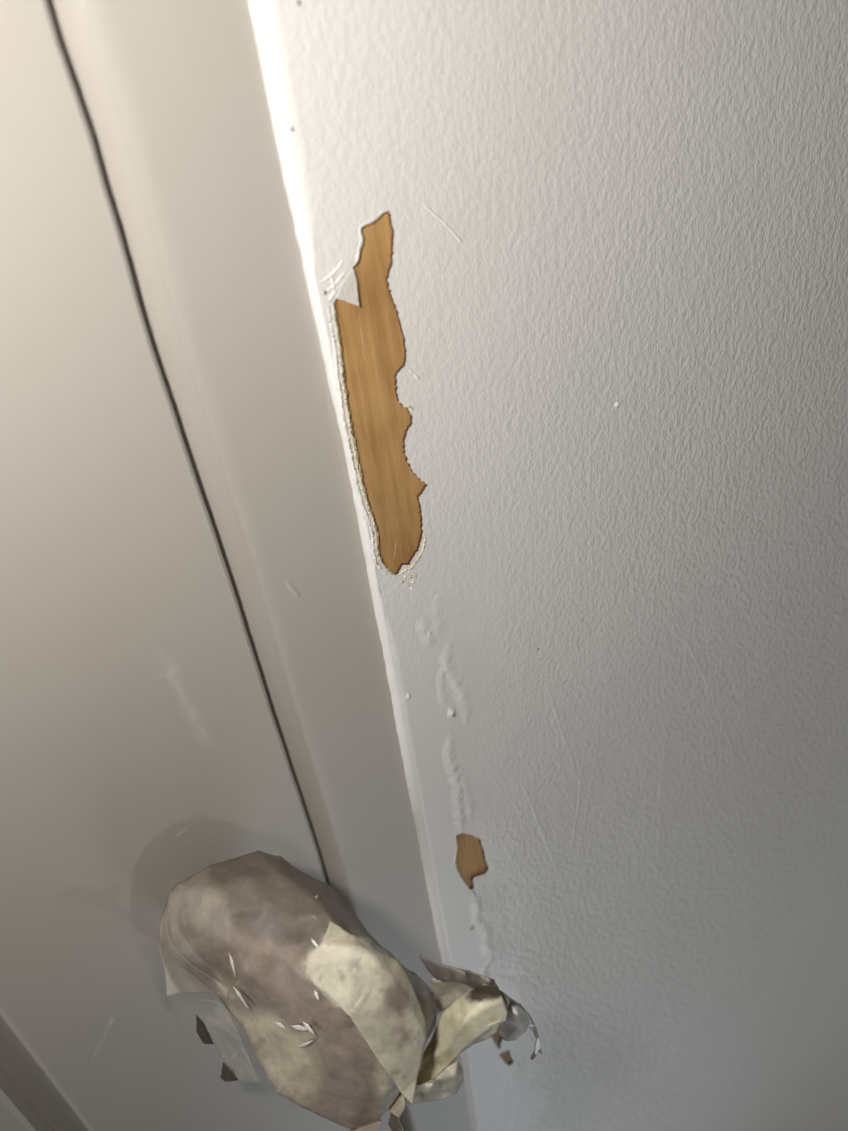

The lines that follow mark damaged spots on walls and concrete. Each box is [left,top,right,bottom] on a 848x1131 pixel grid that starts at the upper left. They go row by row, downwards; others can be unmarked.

peeling [320,209,427,590]
peeling [454,833,489,897]
peeling [491,1030,512,1064]